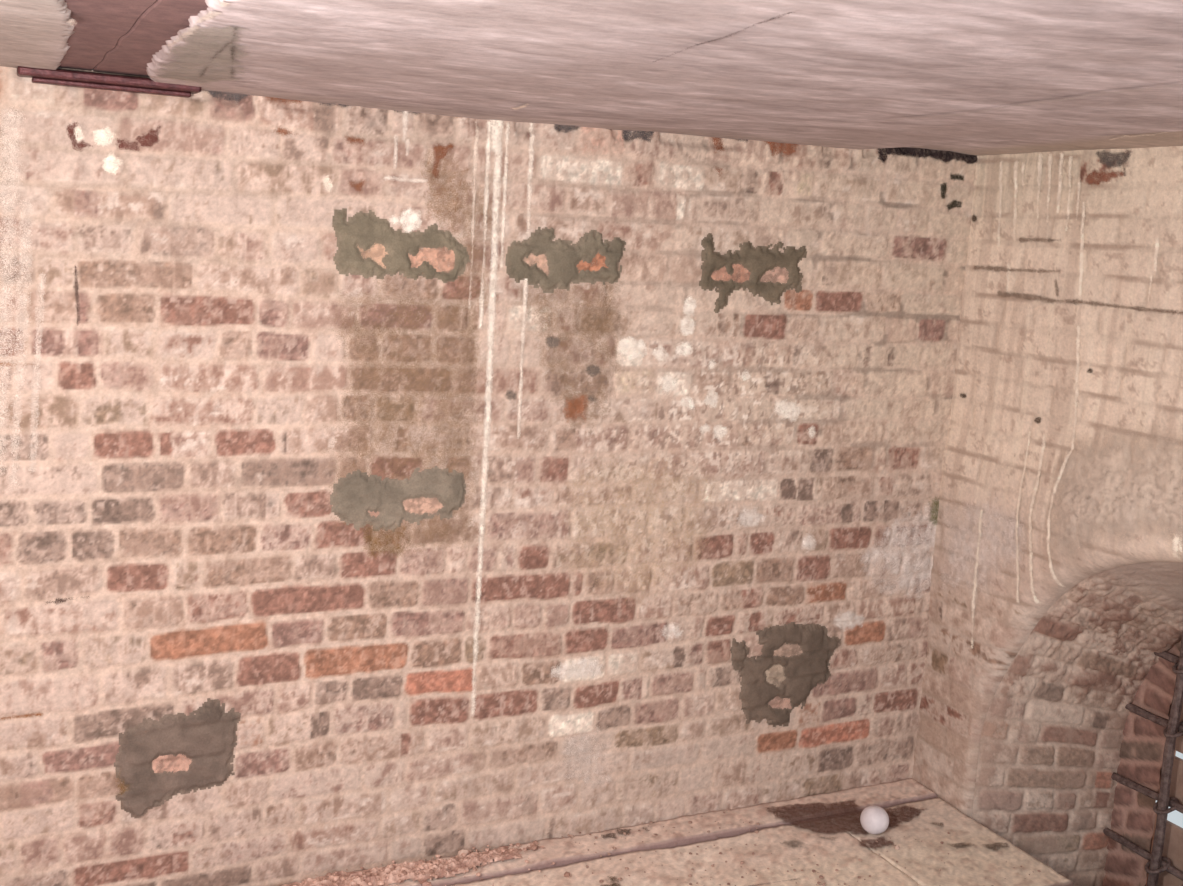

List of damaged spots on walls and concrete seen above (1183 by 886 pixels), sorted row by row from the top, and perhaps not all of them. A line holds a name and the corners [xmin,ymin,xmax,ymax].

crack [653,12,796,62]
leakage [526,123,536,235]
leakage [996,152,1086,296]
flaking render [357,243,387,269]
flaking render [408,246,455,273]
flaking render [523,253,550,275]
flaking render [711,264,789,284]
leakage [510,278,697,439]
leakage [773,398,801,422]
leakage [698,423,727,440]
flaking render [765,643,802,710]
flaking render [152,754,192,774]